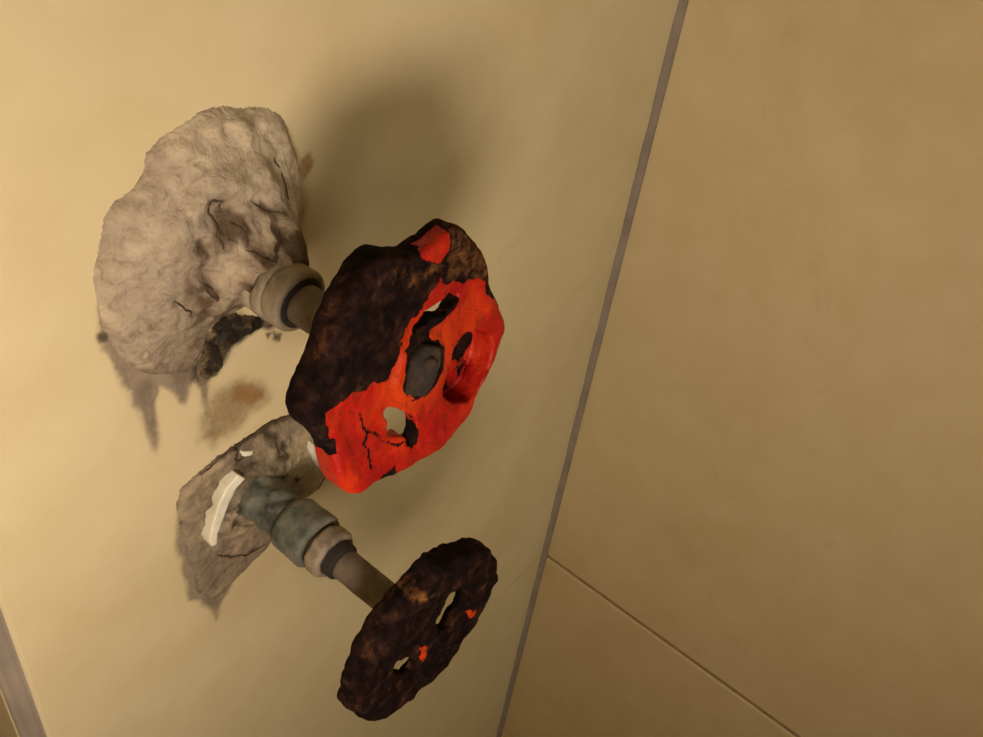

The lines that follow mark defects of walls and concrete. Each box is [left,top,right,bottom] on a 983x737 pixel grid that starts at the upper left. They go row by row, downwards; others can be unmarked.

damp [100,320,209,428]
damp [177,518,231,608]